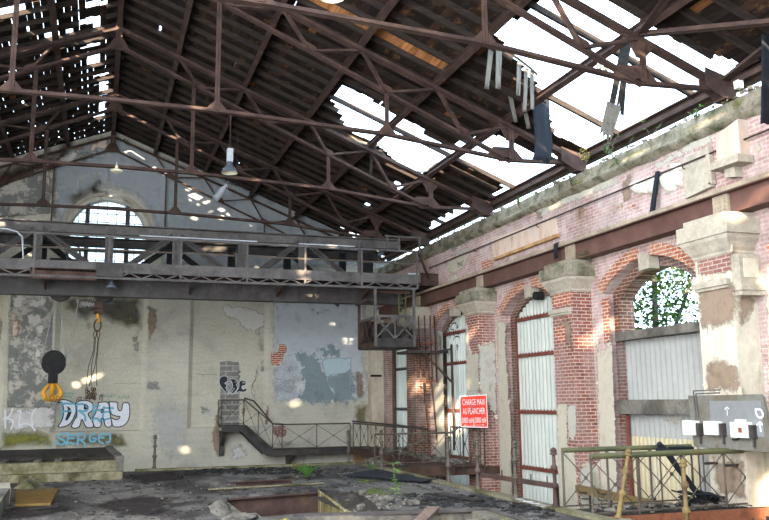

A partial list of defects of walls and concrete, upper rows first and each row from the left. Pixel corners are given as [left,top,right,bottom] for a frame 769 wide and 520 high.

flaking render [5,295,56,432]
peeling [271,344,355,405]
flaking render [465,321,548,507]
flaking render [703,354,743,395]